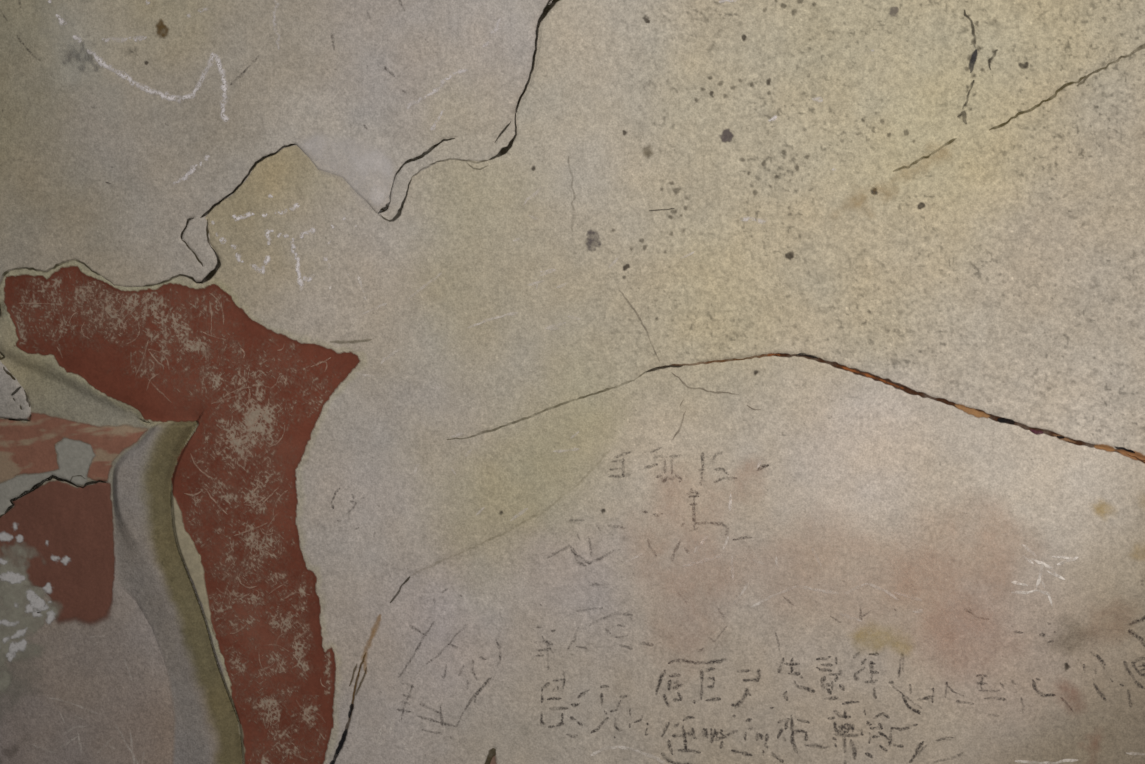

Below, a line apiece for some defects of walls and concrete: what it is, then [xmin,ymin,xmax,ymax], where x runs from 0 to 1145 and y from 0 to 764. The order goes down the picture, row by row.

crack [899,10,998,169]
crack [989,56,1125,130]
peeling [0,0,553,764]
crack [646,353,1145,463]
crack [330,576,410,764]